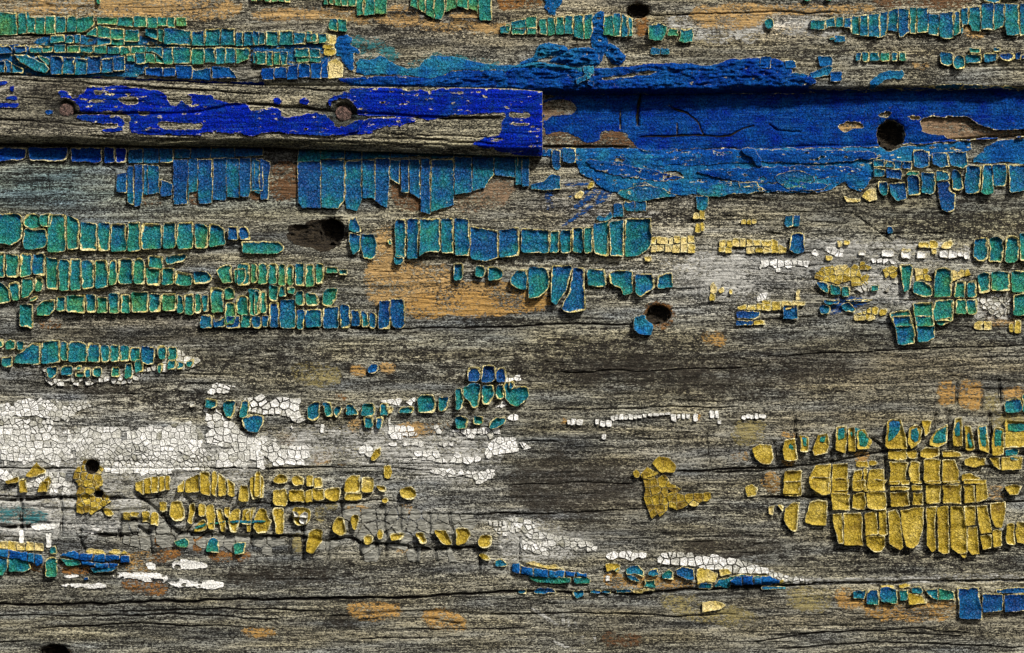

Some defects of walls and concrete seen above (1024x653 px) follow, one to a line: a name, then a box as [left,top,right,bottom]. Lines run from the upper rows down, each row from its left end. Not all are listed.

peeling [0,0,1024,345]
peeling [0,339,201,386]
peeling [0,365,812,612]
peeling [752,394,1024,558]
peeling [853,583,1024,620]